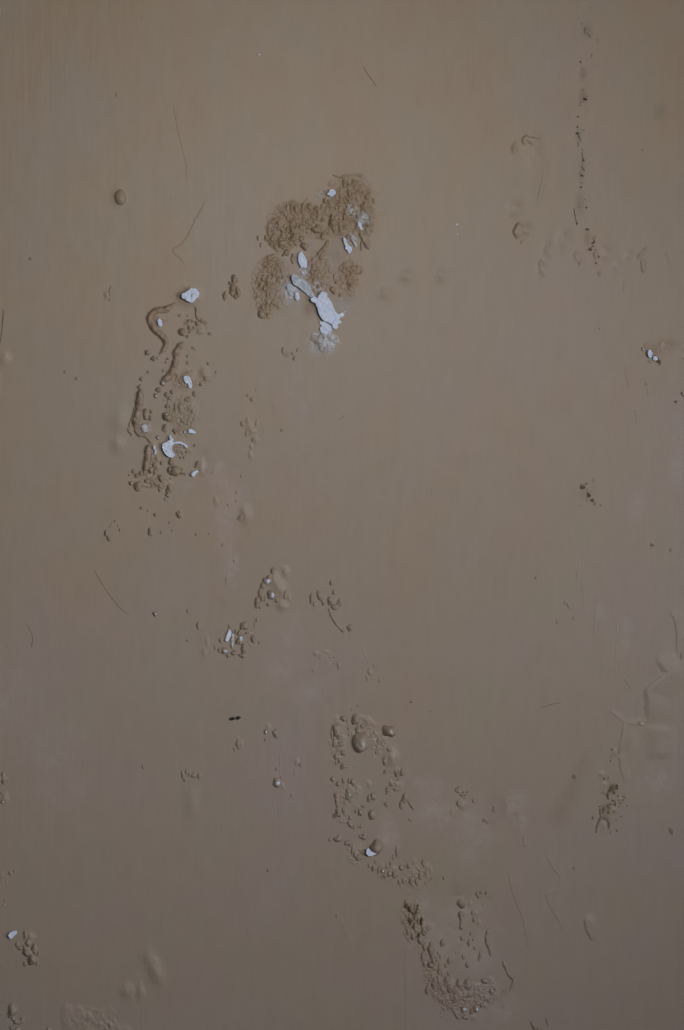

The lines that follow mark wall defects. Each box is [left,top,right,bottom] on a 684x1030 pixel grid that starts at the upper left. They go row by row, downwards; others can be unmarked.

peeling [249,172,383,354]